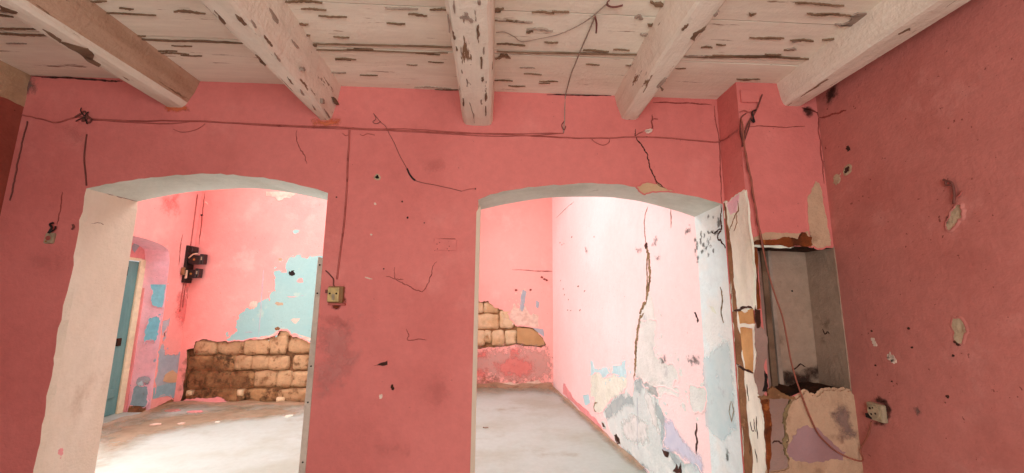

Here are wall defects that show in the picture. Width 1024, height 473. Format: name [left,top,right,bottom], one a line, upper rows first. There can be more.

peeling [128,279,181,412]
peeling [226,253,323,343]
crack [386,238,448,292]
peeling [505,288,544,336]
peeling [563,293,709,473]
crack [633,102,726,378]
spalling [723,146,872,473]
spalling [944,202,967,233]
spalling [949,316,969,357]